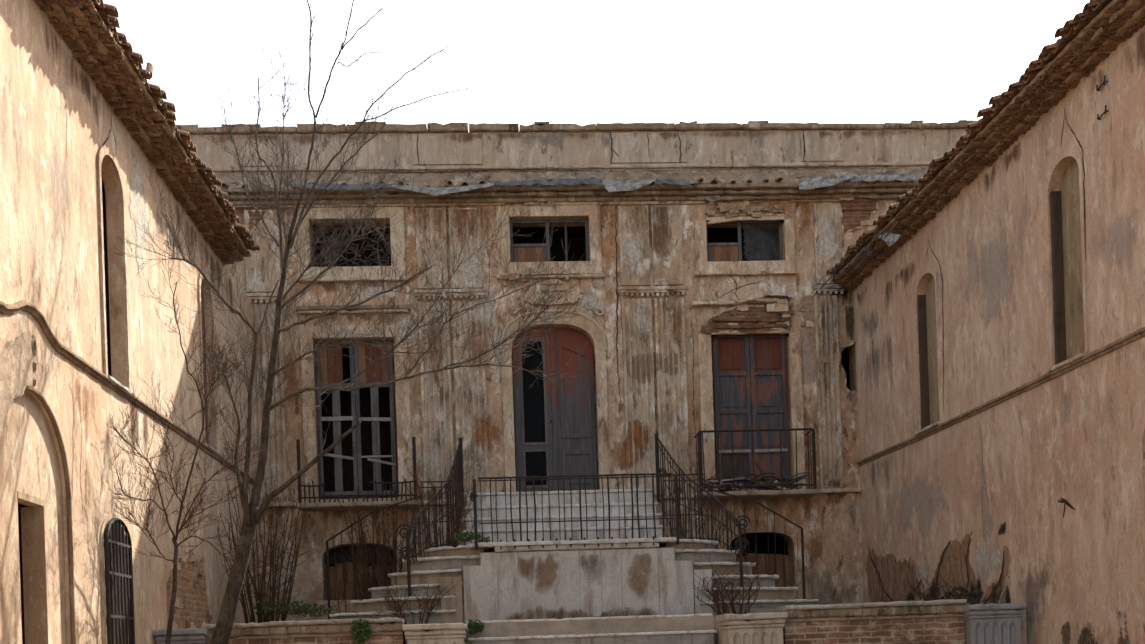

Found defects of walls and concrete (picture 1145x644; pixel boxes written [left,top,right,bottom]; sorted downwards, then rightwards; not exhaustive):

spalling [700,290,854,392]
spalling [0,331,39,439]
spalling [167,550,213,629]
spalling [866,532,1011,605]
peeling [1061,622,1098,644]